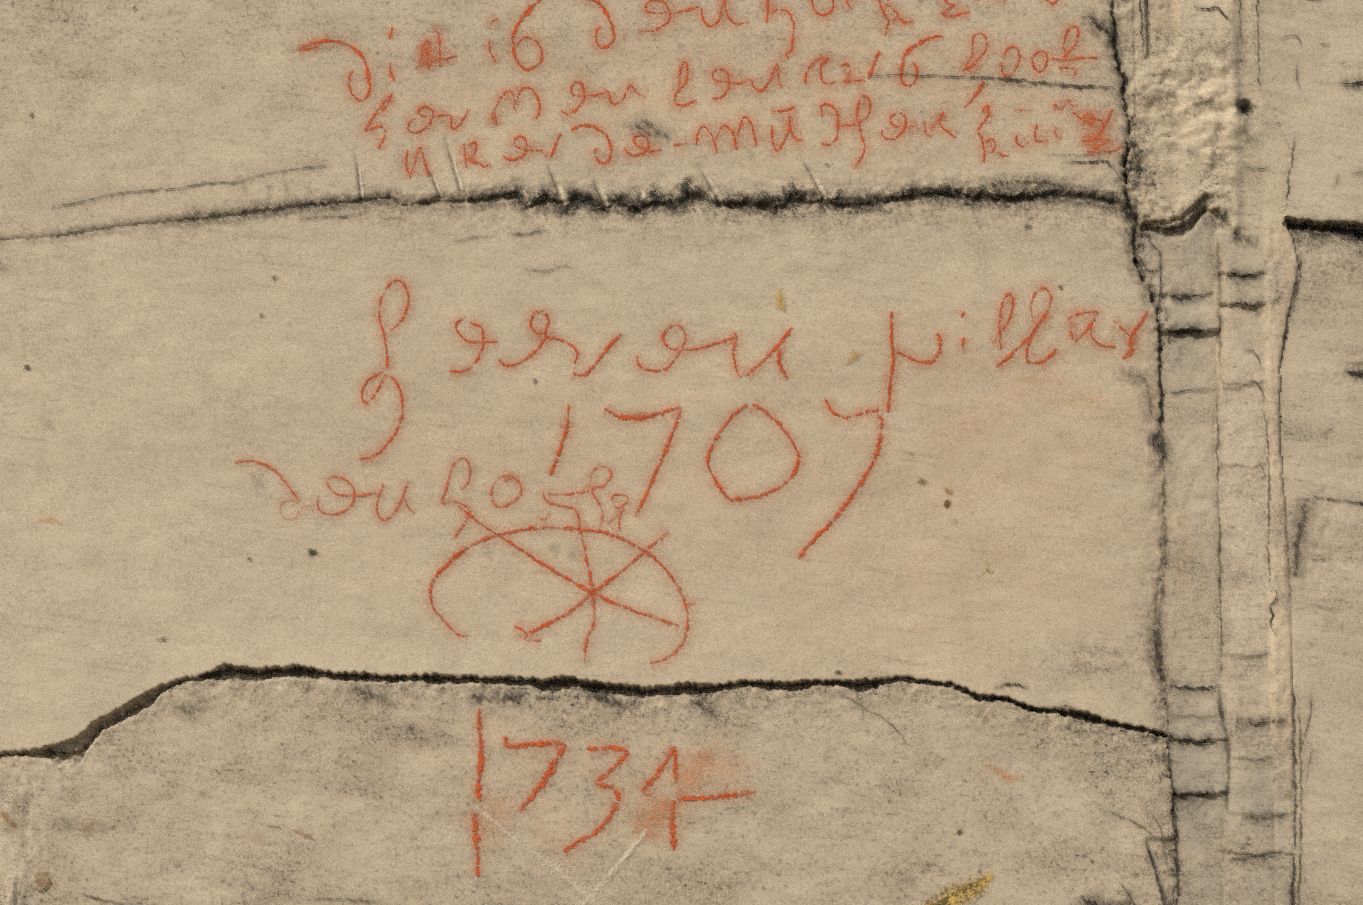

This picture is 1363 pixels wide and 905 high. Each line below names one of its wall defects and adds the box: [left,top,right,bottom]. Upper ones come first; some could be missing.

crack [199,141,1363,905]